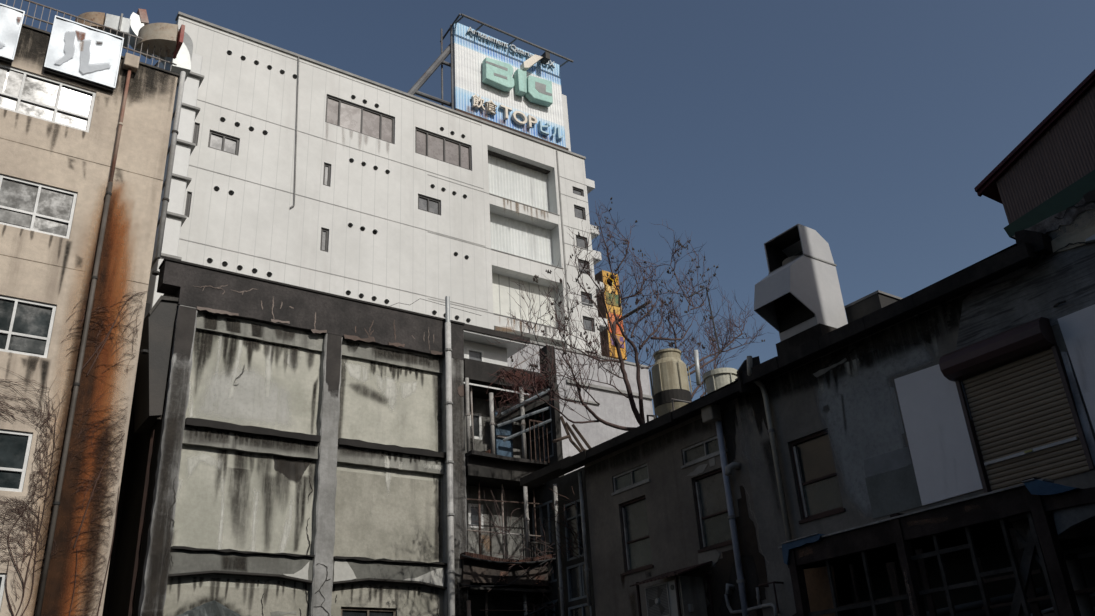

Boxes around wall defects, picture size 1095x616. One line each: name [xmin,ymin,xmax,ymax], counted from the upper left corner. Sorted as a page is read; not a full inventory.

damp [50,235,81,286]
corrosion [31,192,128,616]
damp [178,330,314,552]
damp [346,362,423,408]
damp [384,452,444,487]
damp [585,291,973,475]
damp [194,577,306,599]
crack [299,487,337,616]